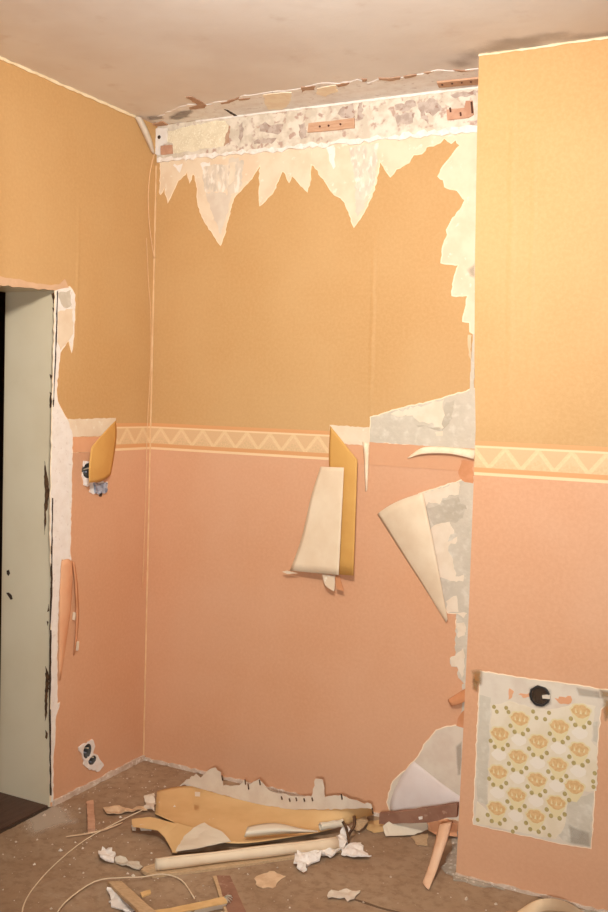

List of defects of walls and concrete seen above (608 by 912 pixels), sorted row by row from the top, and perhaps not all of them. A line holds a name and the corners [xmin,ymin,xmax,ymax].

flaking render [151,68,479,127]
flaking render [370,389,476,449]
flaking render [44,287,95,802]
flaking render [425,480,474,684]